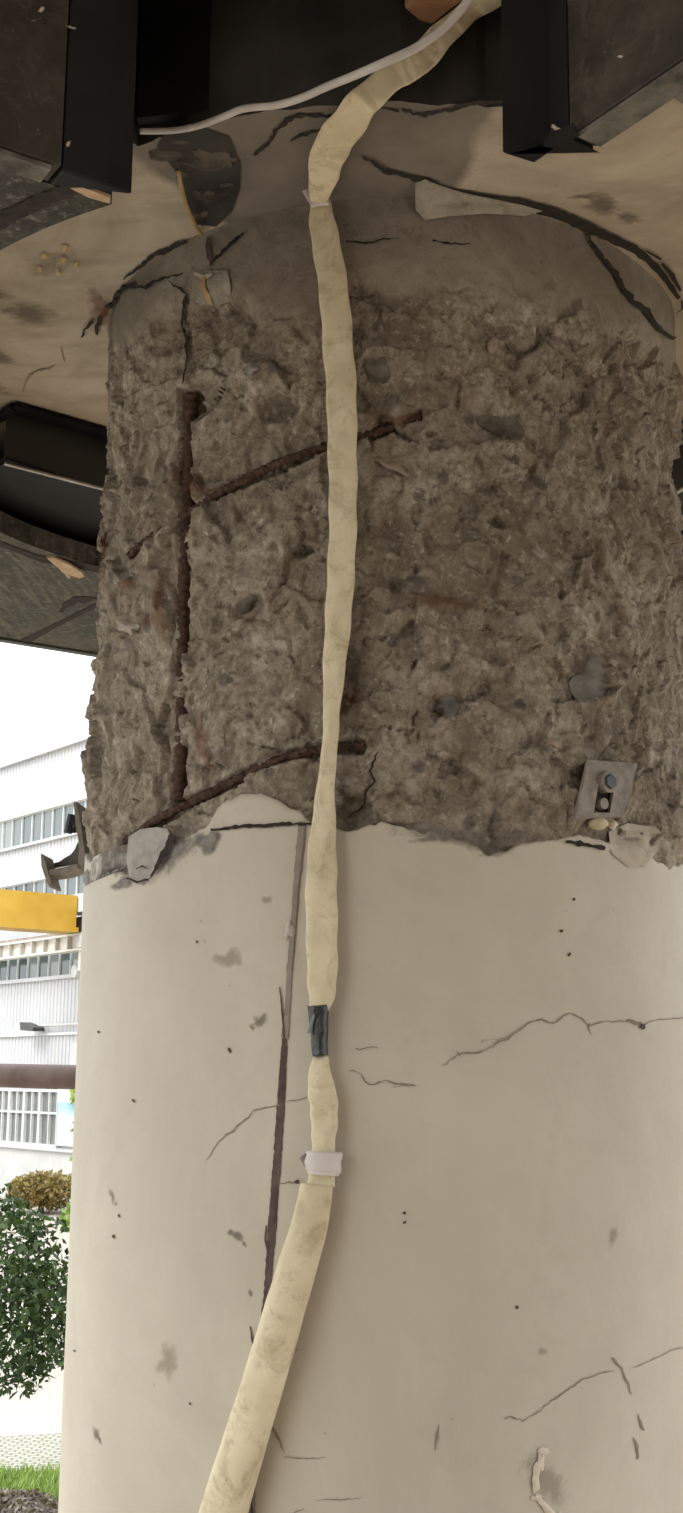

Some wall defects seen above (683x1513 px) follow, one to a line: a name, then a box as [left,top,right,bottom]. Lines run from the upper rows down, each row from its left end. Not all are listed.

crack [253,86,347,156]
crack [382,100,502,118]
crack [346,156,683,340]
crack [0,232,244,409]
spalling [80,198,683,884]
crack [350,1013,683,1087]
crack [206,1097,307,1160]
crack [504,1347,683,1422]
peeling [531,1447,561,1513]